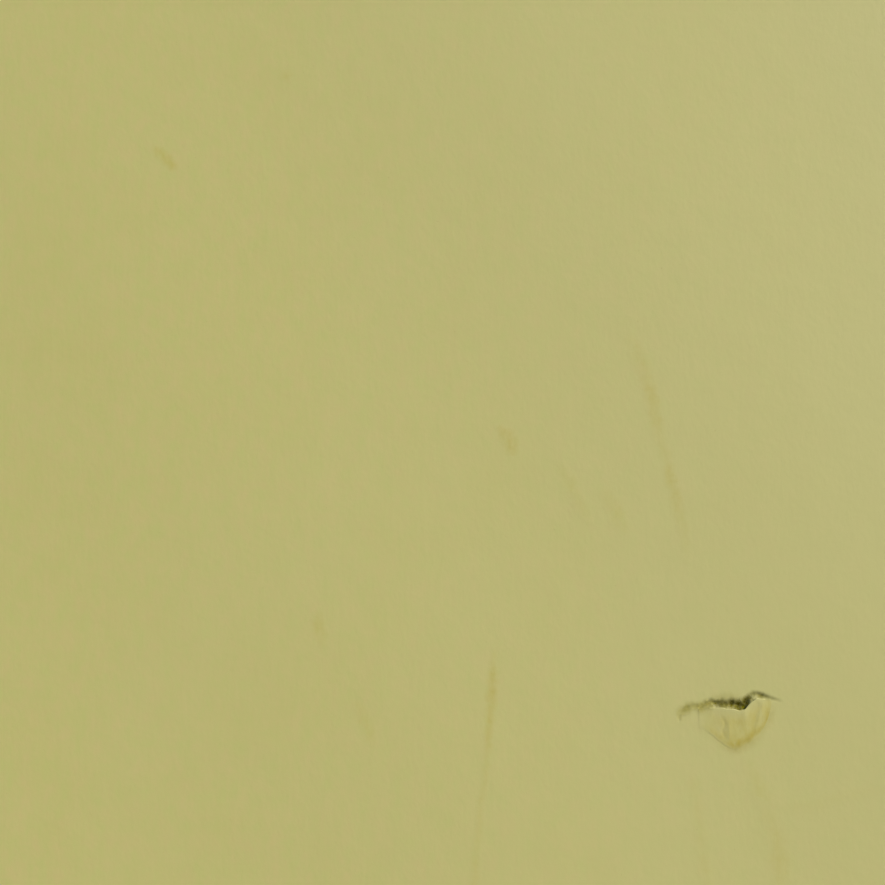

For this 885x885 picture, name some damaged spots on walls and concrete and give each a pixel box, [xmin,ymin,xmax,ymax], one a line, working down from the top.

peeling [699,695,772,749]